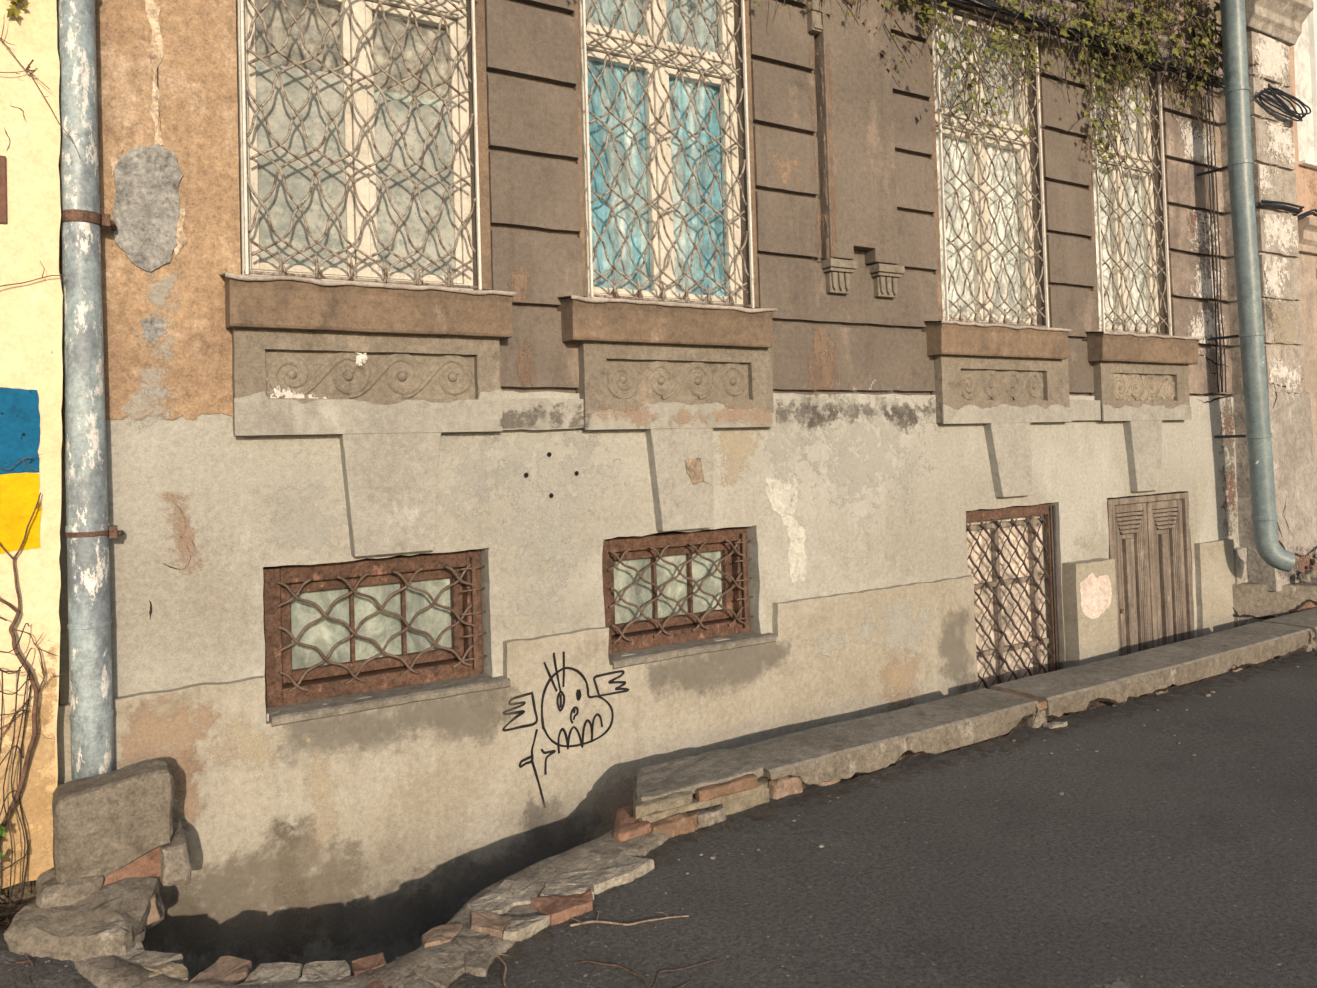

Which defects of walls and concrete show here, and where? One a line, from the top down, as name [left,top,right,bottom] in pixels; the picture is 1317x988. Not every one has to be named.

flaking render [1176,118,1219,165]
flaking render [1184,210,1227,358]
peeling [1254,34,1305,402]
peeling [467,404,656,633]
peeling [677,379,943,584]
water stain [143,691,634,970]